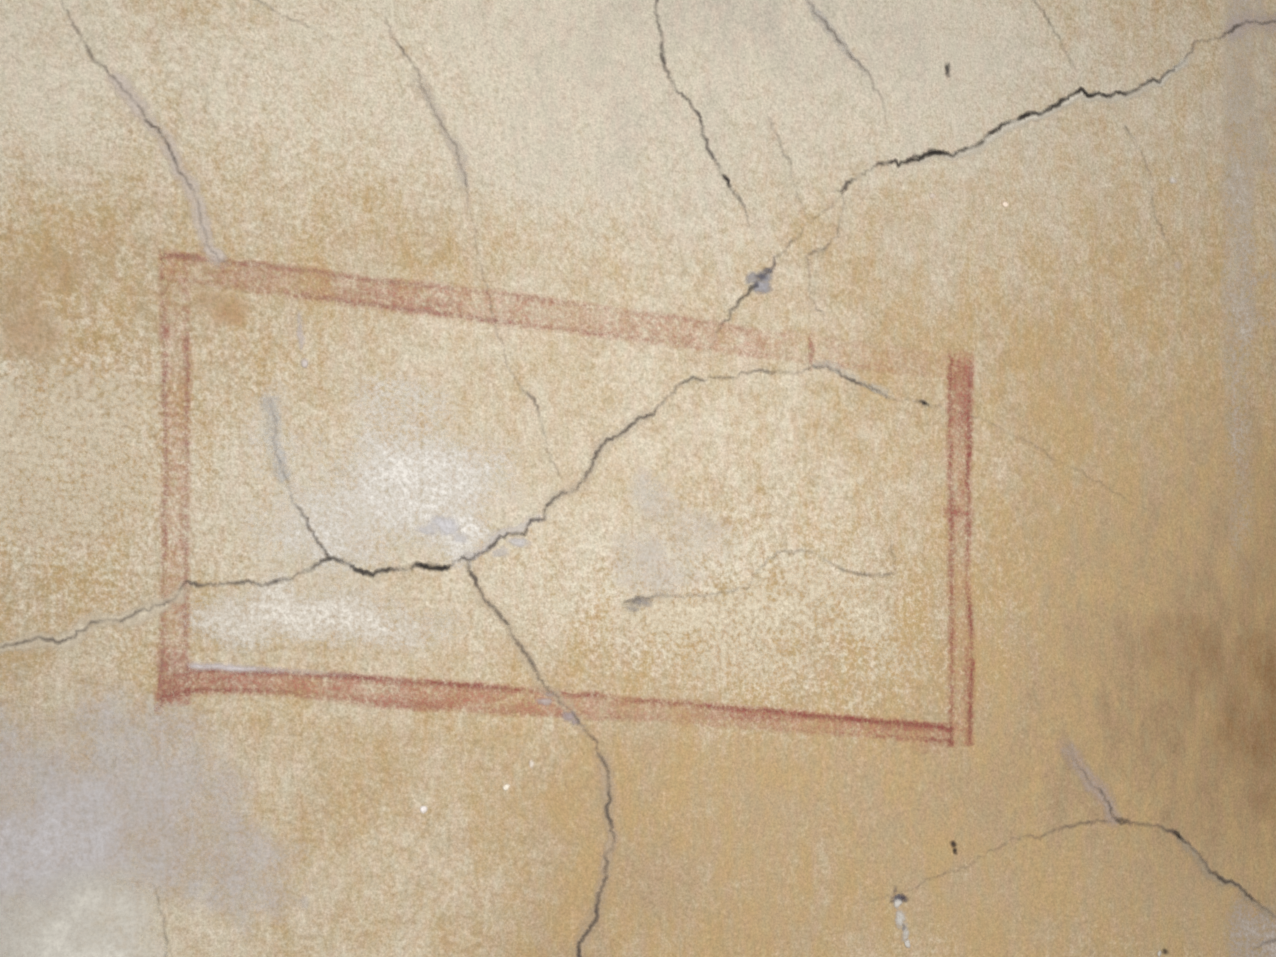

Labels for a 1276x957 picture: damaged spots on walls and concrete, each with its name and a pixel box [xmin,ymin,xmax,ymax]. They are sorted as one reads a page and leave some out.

crack [108,73,226,262]
crack [682,94,730,185]
crack [878,57,1188,166]
crack [814,362,887,393]
crack [586,414,653,476]
crack [0,582,202,652]
crack [307,494,559,664]
crack [577,759,617,957]
crack [1166,830,1268,915]